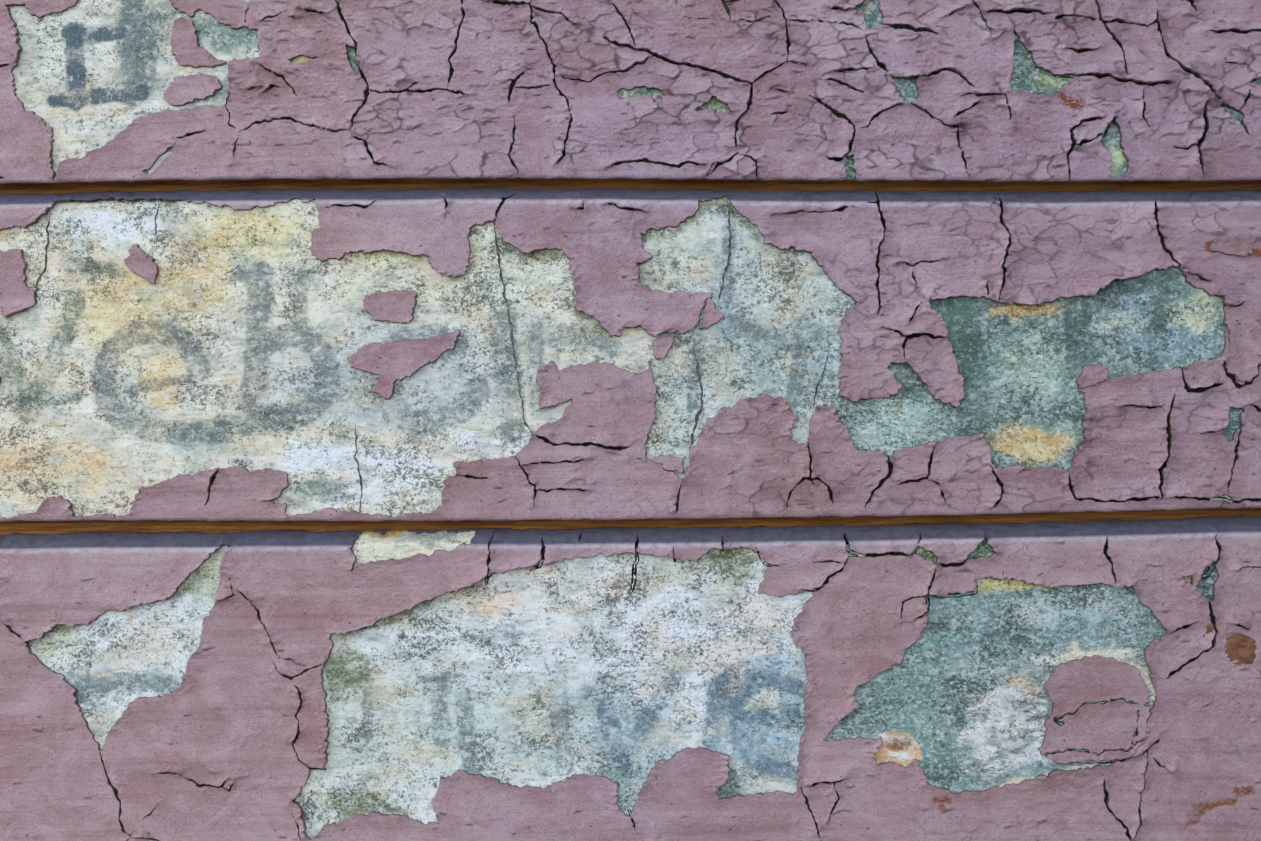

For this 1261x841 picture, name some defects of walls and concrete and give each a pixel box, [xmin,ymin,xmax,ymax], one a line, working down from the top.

peeling [9,0,261,180]
crack [225,0,465,166]
crack [494,0,1231,508]
peeling [0,197,1226,570]
crack [1069,363,1261,503]
peeling [1224,407,1243,442]
peeling [28,544,227,749]
peeling [293,544,816,838]
crack [629,535,639,596]
peeling [824,577,1166,793]
crack [1044,699,1165,841]
crack [1168,542,1248,677]